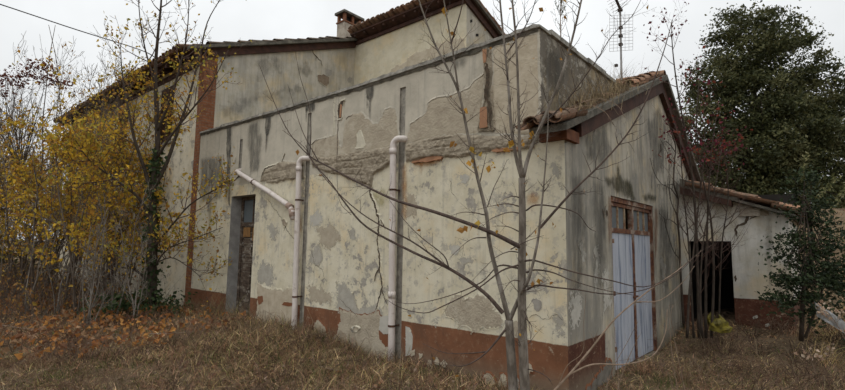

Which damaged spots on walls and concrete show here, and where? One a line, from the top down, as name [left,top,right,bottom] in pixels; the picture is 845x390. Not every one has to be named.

spalling [261,32,542,188]
damp [606,167,634,199]
peeling [308,209,358,267]
peeling [239,260,388,360]